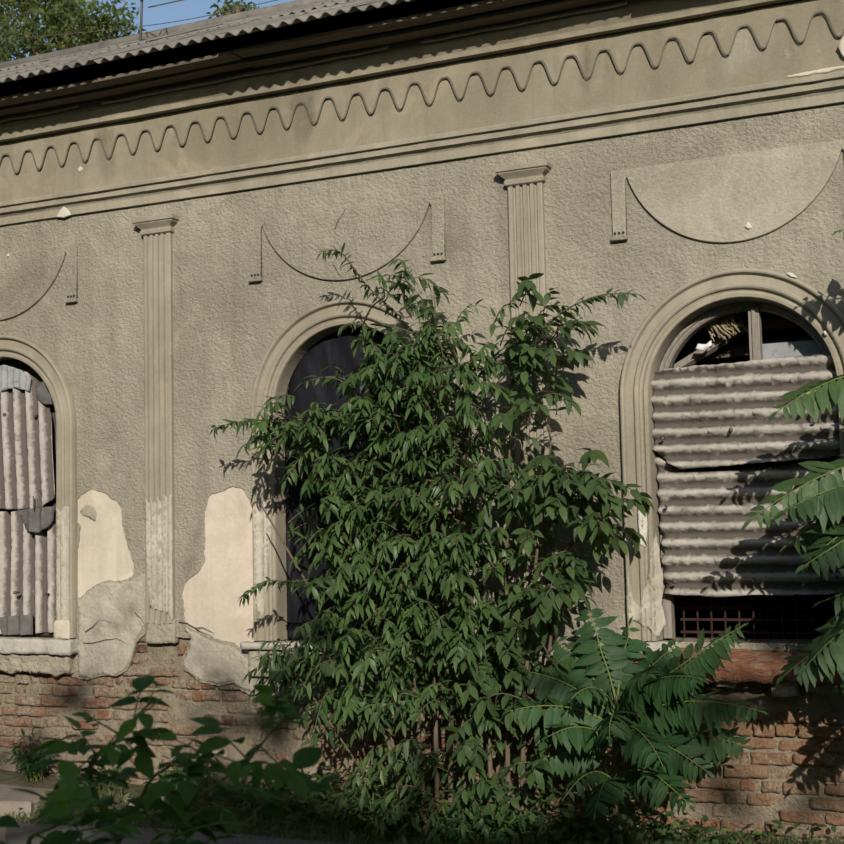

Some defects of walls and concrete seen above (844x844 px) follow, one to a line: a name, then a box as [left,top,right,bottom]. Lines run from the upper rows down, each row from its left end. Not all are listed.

peeling [786,36,844,78]
peeling [56,489,134,621]
peeling [145,486,294,691]
peeling [626,511,679,660]
spalling [300,650,459,682]